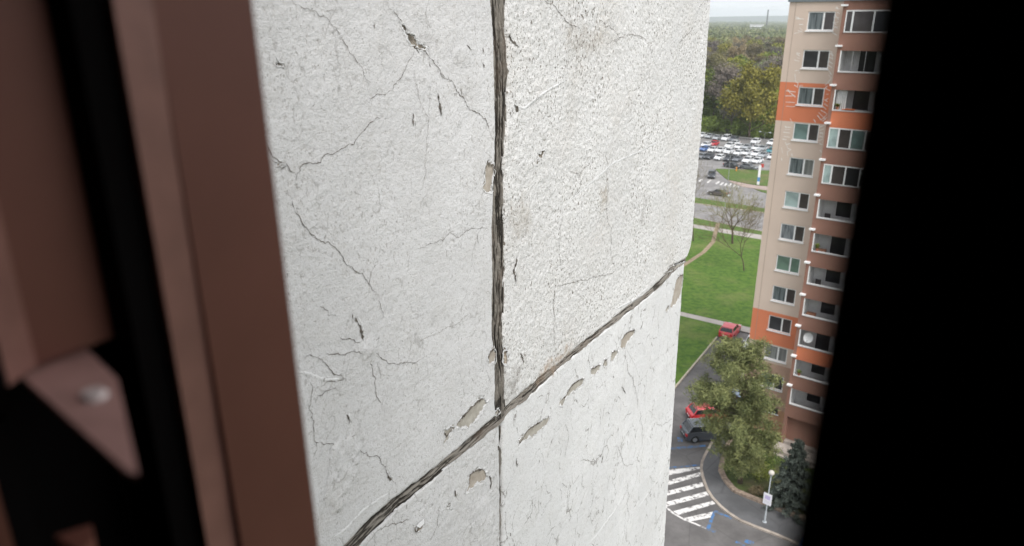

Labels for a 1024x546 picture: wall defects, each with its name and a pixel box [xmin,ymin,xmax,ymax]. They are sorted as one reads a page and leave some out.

crack [547,3,654,60]
peeling [482,160,496,195]
crack [270,3,492,485]
peeling [664,261,685,313]
peeling [516,320,644,464]
peeling [443,395,501,444]
peeling [445,467,493,510]